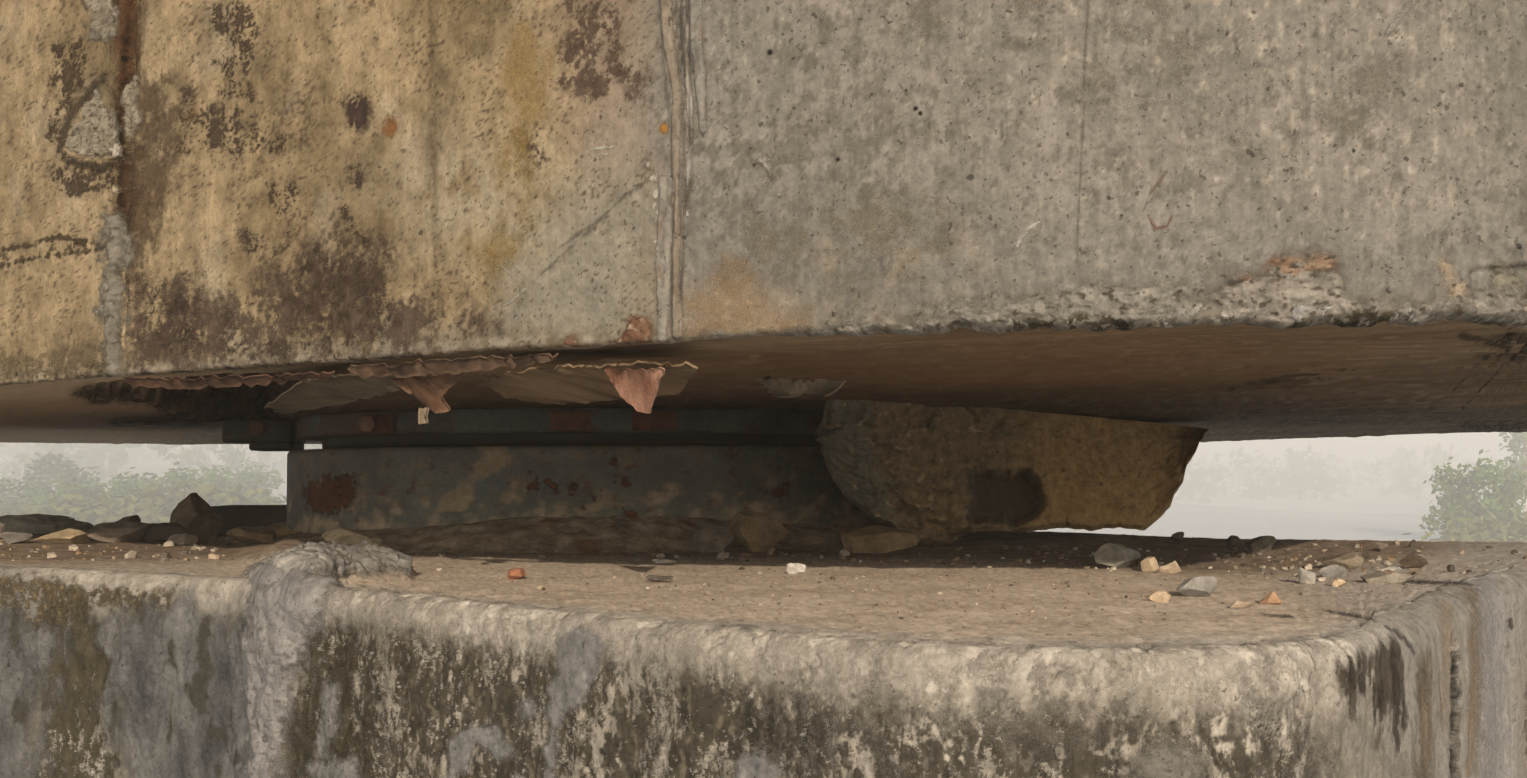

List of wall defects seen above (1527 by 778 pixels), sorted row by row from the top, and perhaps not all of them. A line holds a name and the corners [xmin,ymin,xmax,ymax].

spalling [83,0,118,43]
leakage [556,0,641,99]
spalling [65,75,141,158]
corrosion [109,0,141,234]
leakage [42,0,502,373]
spalling [704,254,1527,339]
leakage [0,342,106,386]
peeling [0,338,698,428]
peeling [755,376,846,398]
corrosion [300,472,357,516]
leakage [0,576,175,778]
leakage [269,583,1453,778]